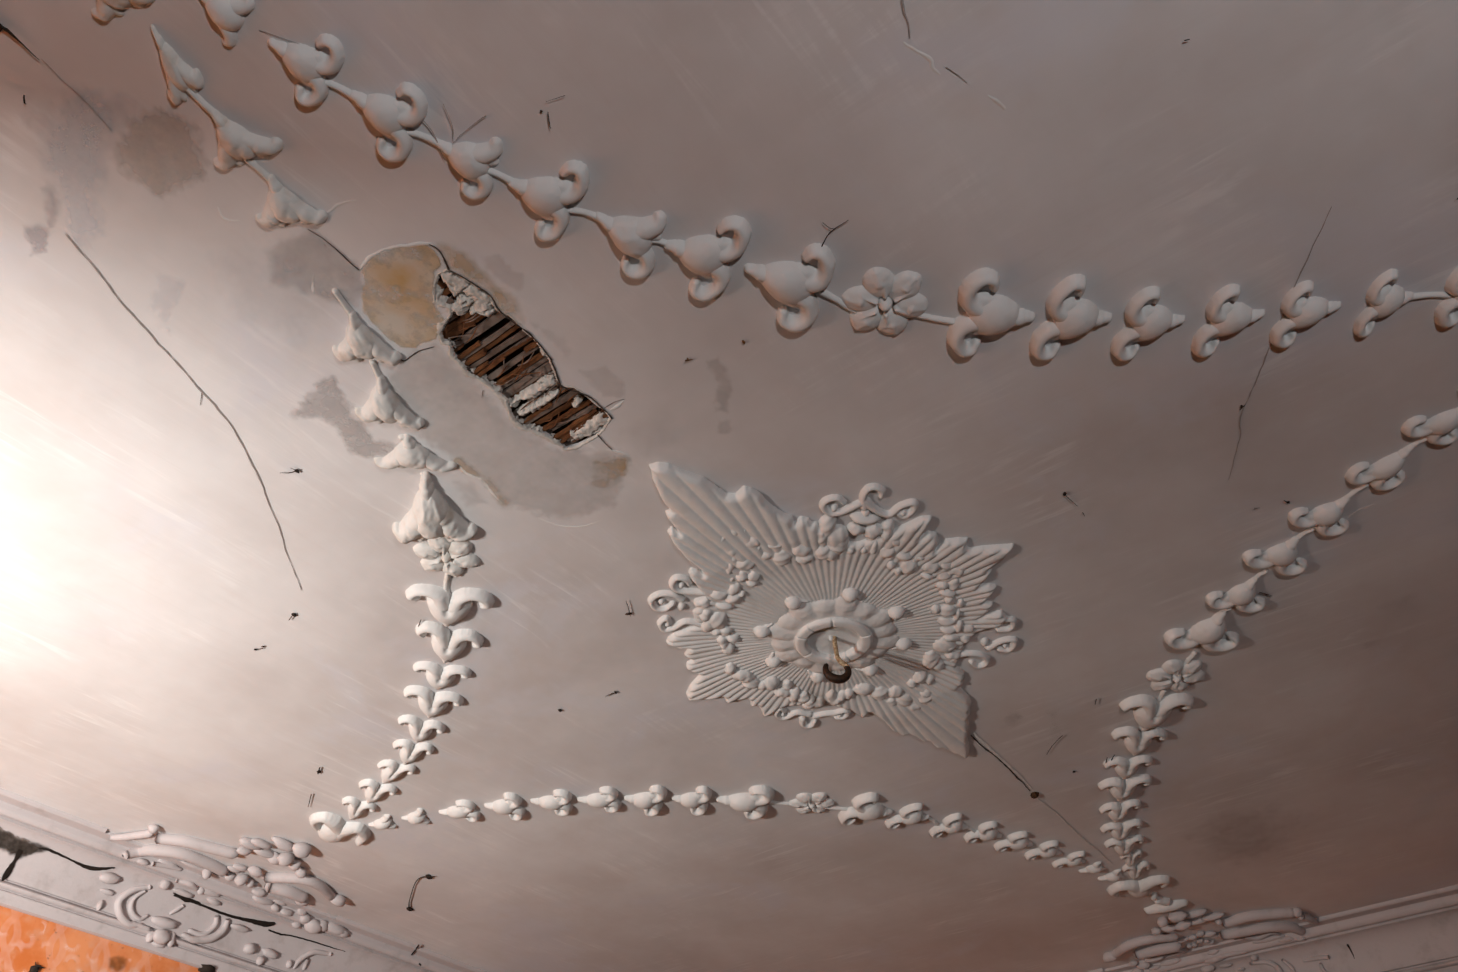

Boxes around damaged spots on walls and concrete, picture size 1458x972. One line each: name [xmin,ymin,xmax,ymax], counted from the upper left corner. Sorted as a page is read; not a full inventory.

crack [901,0,1006,110]
flaking render [308,229,628,487]
crack [1,848,115,881]
crack [173,892,345,952]